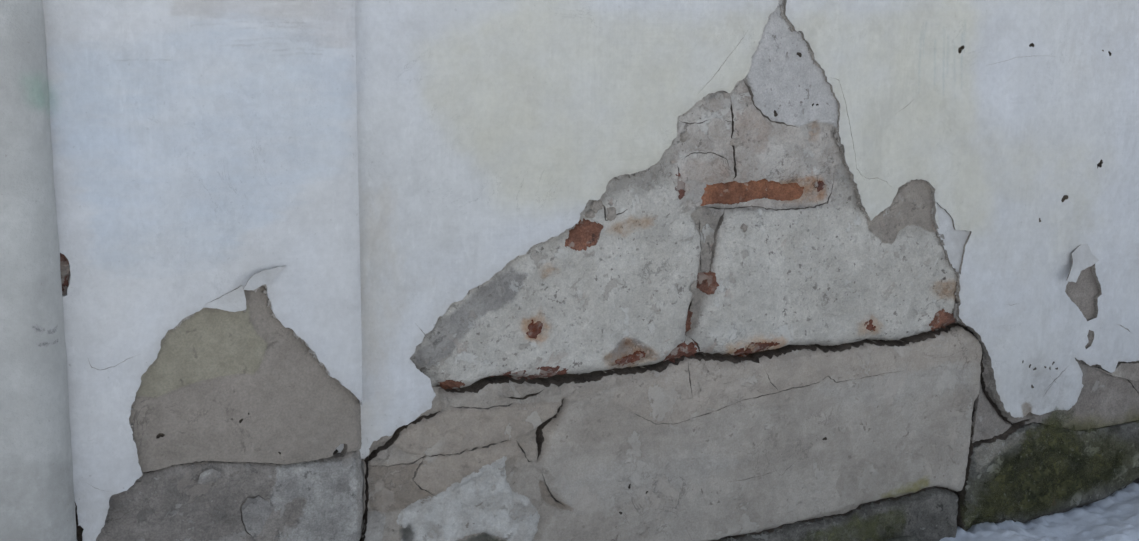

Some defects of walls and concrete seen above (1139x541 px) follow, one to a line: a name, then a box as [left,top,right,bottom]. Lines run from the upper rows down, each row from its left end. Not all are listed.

crack [240,495,266,536]
spalling [96,266,1139,541]
spalling [410,0,970,391]
crack [360,323,1029,541]
peeling [1065,244,1099,348]